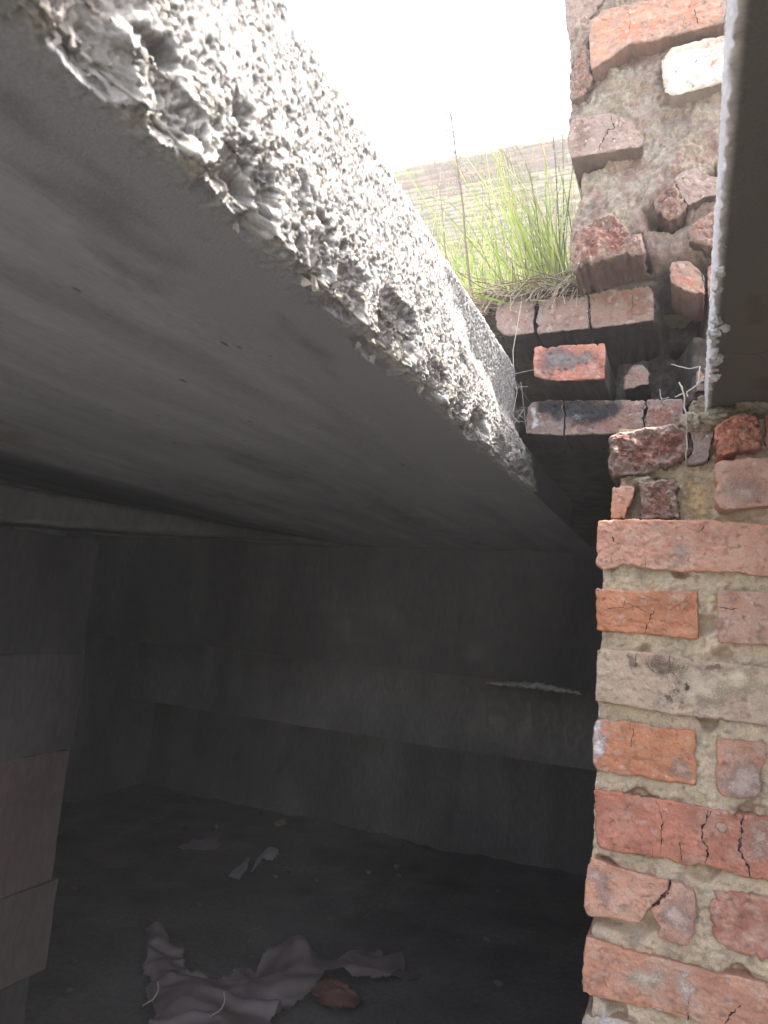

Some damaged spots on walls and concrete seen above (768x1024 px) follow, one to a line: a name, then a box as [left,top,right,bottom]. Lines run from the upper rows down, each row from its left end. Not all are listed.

spalling [0,0,537,493]
crack [609,598,670,674]
spalling [486,681,583,695]
crack [649,805,712,906]
crack [737,817,751,877]